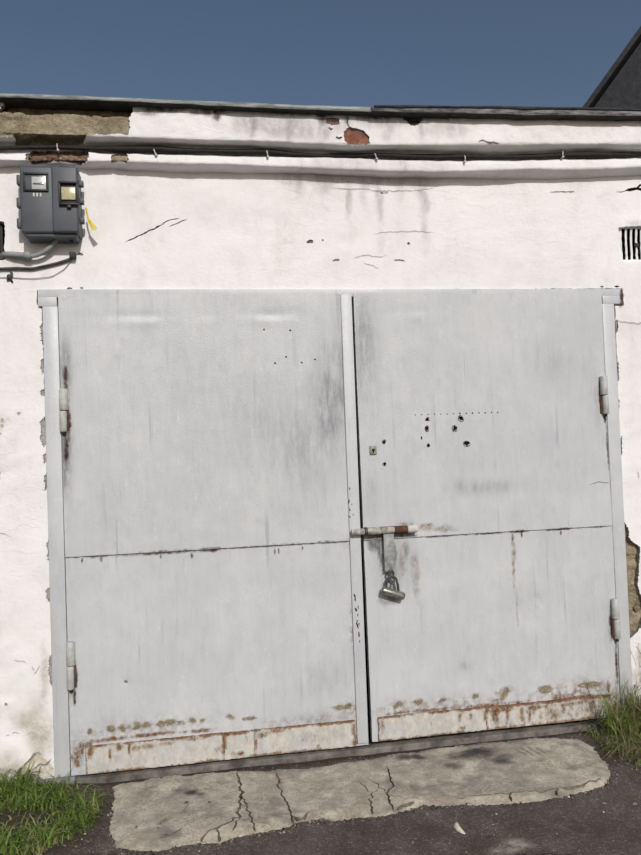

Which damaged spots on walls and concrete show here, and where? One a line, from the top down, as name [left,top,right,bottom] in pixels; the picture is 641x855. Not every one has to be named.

spalling [0,103,131,166]
spalling [325,117,370,146]
crack [620,184,641,193]
crack [126,218,186,242]
rust [138,548,220,557]
spalling [624,522,641,638]
rust [394,699,446,714]
rust [459,688,540,729]
rust [71,718,208,767]
crack [201,771,256,842]
crack [274,771,311,824]
crack [354,767,414,814]